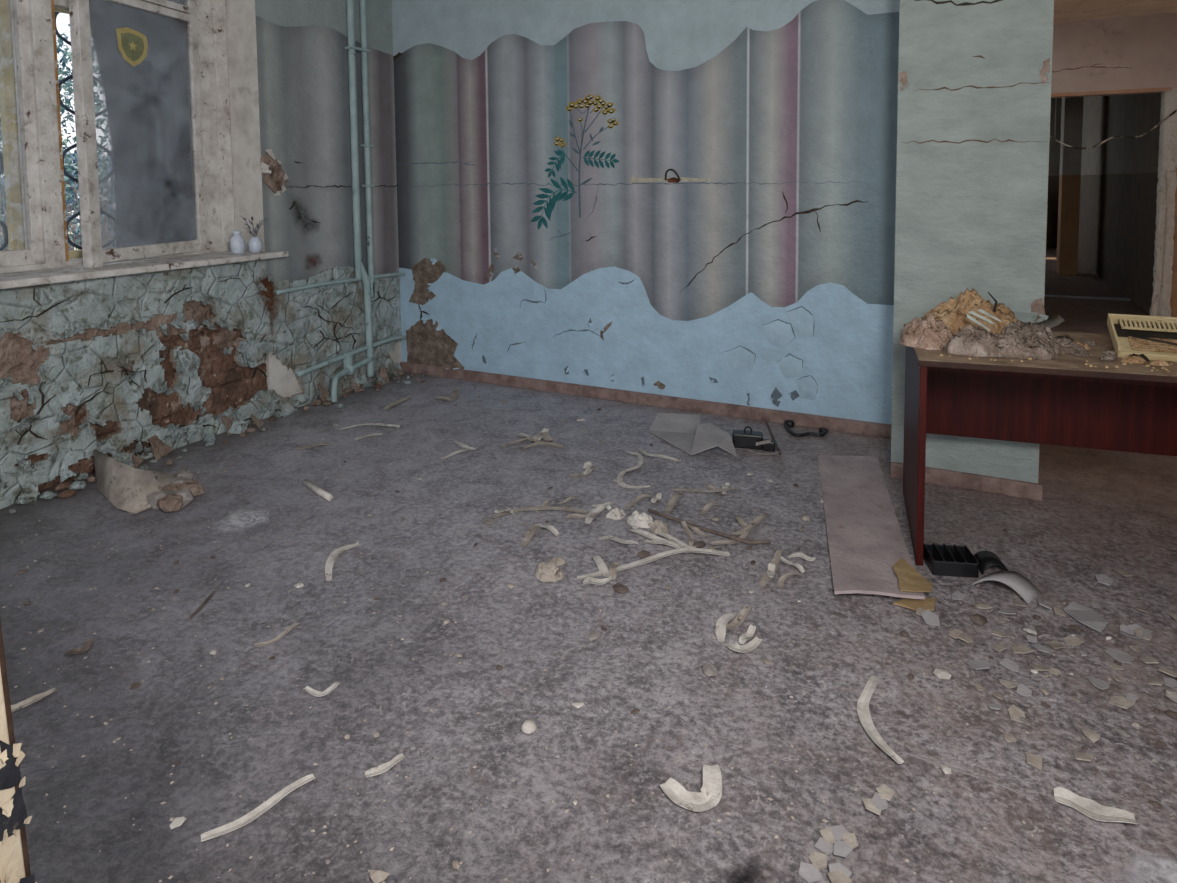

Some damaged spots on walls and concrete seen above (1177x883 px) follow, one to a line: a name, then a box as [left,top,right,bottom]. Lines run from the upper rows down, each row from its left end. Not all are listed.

flaking render [406,258,464,370]
flaking render [0,296,296,504]
peeling [303,367,390,402]